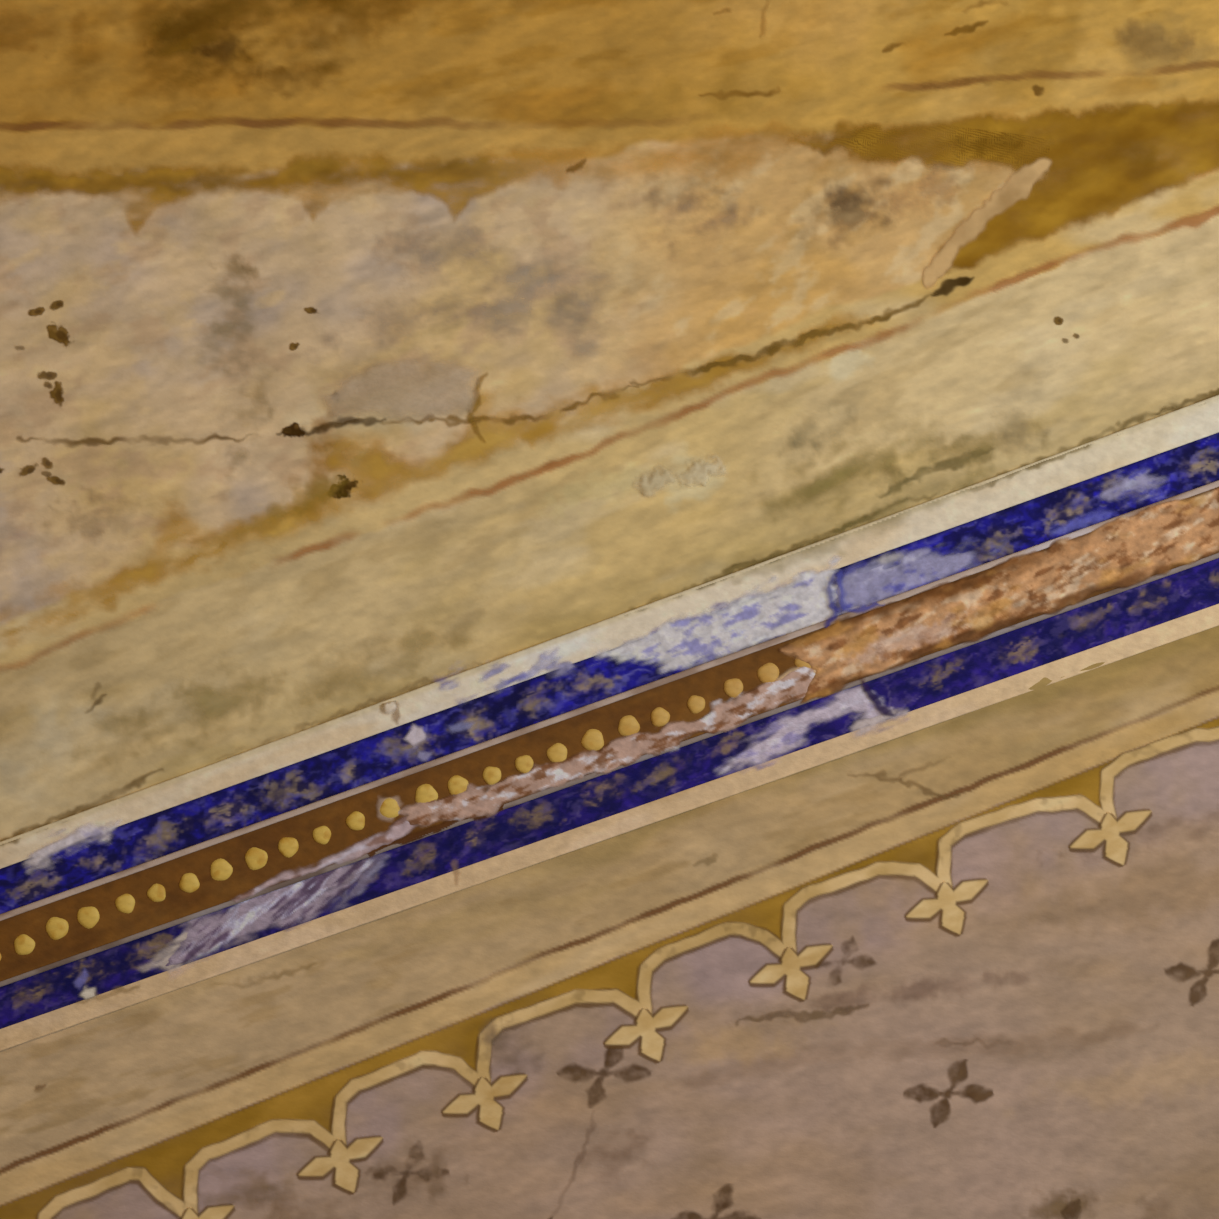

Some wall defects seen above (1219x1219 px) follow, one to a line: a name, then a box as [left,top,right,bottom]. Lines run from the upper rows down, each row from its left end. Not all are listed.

water stain [150,2,268,59]
spalling [29,300,70,346]
crack [692,277,973,374]
spalling [38,371,64,405]
crack [67,437,119,445]
spalling [283,422,304,437]
crack [282,417,376,435]
crack [418,378,535,430]
spalling [21,458,65,485]
crack [701,460,962,588]
peeling [144,469,1219,972]
peeling [75,970,95,999]